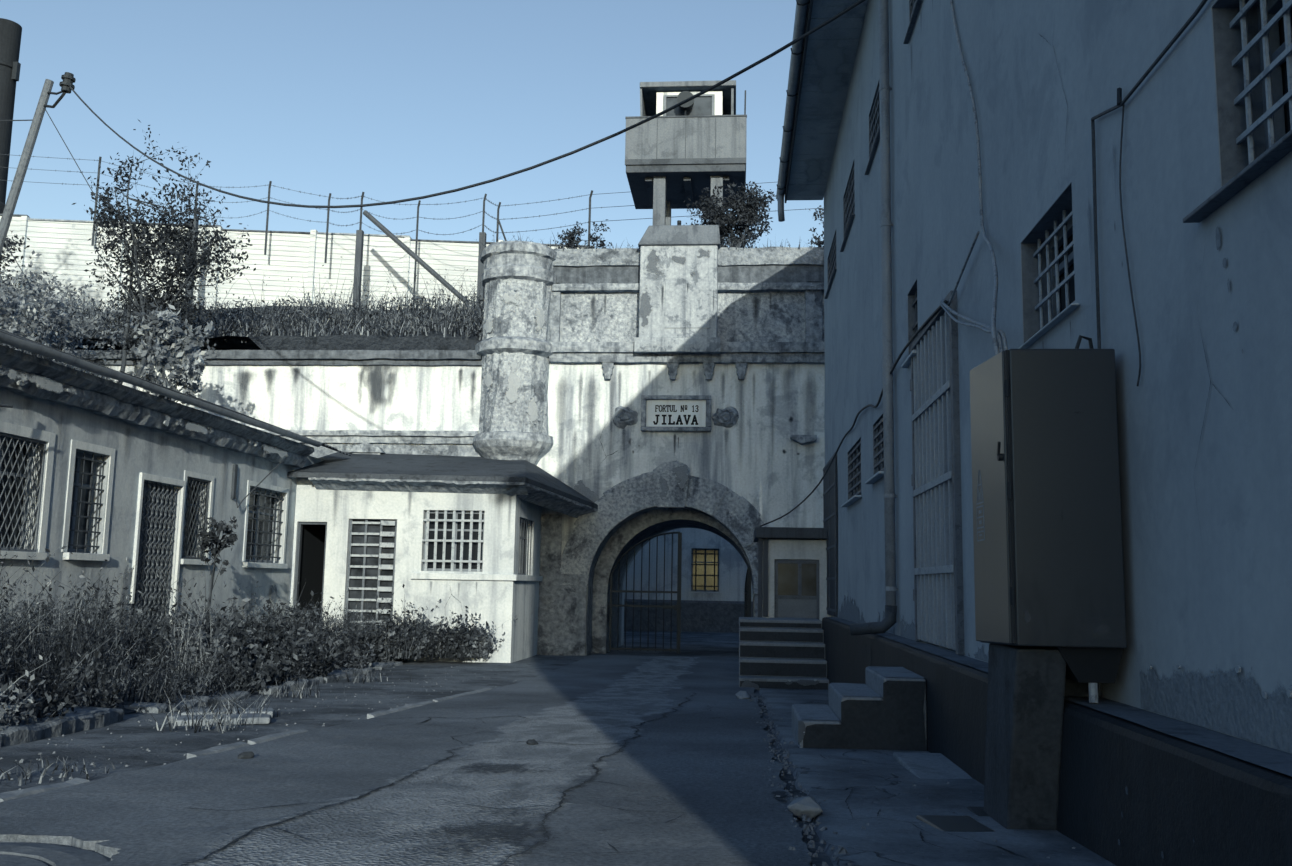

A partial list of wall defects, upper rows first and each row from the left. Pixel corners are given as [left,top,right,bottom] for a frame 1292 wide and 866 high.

water stain [240,372,250,398]
water stain [360,365,394,404]
flaking render [1139,665,1292,753]
crack [180,694,712,866]